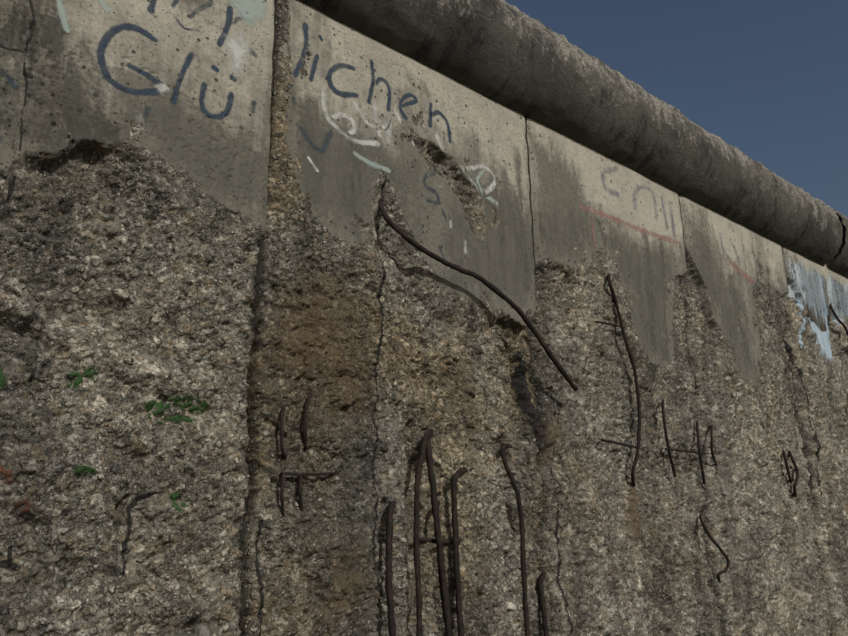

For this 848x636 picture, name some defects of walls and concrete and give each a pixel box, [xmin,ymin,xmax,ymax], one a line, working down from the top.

crack [0,0,36,150]
spalling [0,0,578,636]
spalling [526,236,848,636]